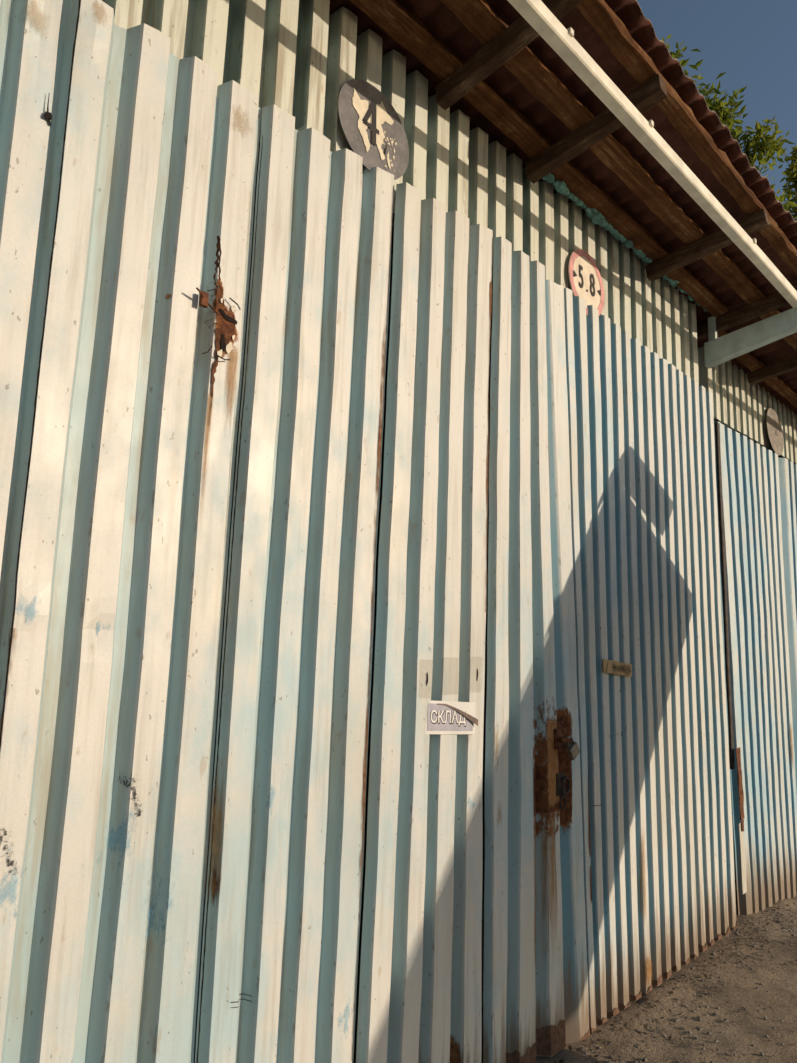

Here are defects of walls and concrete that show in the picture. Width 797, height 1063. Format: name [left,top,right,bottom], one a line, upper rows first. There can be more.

corrosion [211,279,238,407]
corrosion [204,395,213,474]
corrosion [211,794,222,903]
corrosion [533,700,572,956]
corrosion [580,921,738,1042]
corrosion [450,1035,461,1063]
corrosion [506,1019,566,1063]